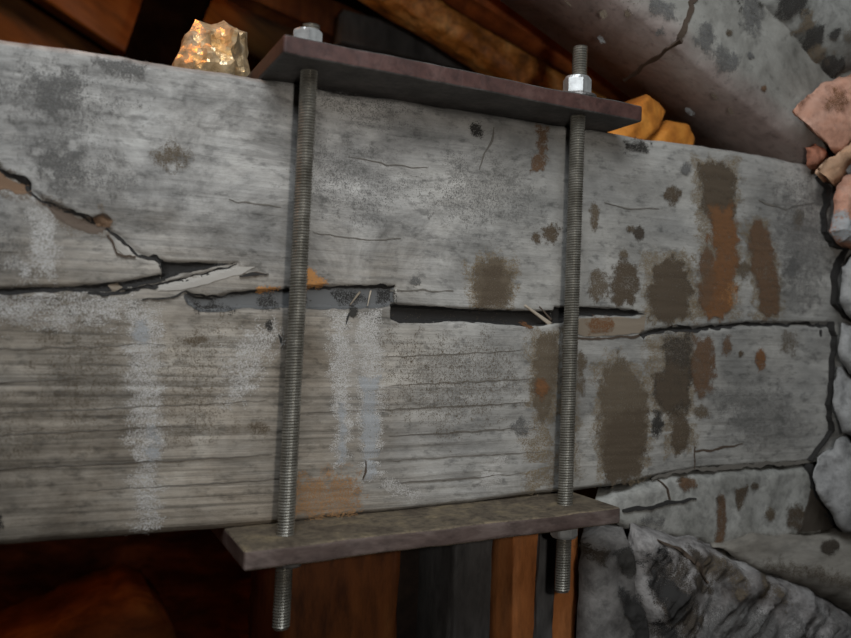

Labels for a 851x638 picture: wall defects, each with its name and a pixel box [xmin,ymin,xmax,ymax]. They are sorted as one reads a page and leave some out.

crack [623,0,697,82]
crack [348,156,427,168]
crack [479,127,495,170]
damp [0,42,286,536]
rust [696,200,782,323]
crack [0,168,851,525]
rust [689,333,733,399]
rust [755,348,766,372]